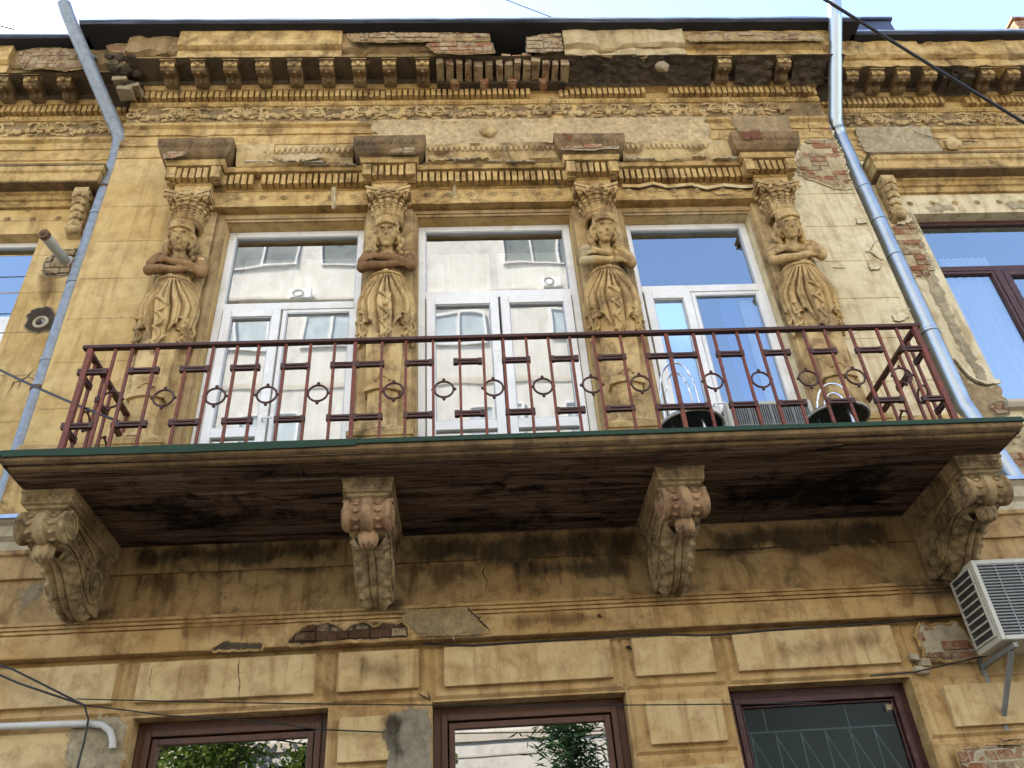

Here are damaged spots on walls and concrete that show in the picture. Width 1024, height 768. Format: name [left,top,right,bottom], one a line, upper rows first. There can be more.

flaking render [17,47,83,72]
flaking render [526,33,563,53]
flaking render [795,124,855,190]
flaking render [891,211,1011,418]
water stain [717,463,898,511]
water stain [129,493,299,530]
water stain [139,541,336,592]
water stain [413,511,636,584]
water stain [716,522,889,570]
flaking render [211,639,265,653]
flaking render [285,607,486,648]
flaking render [955,741,1024,768]